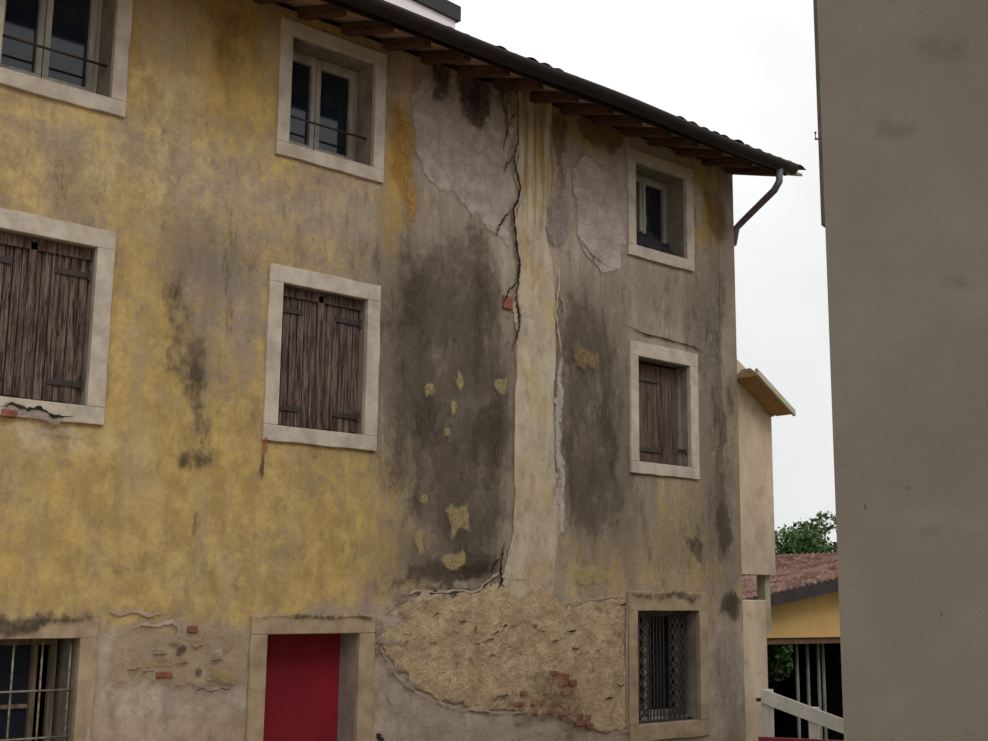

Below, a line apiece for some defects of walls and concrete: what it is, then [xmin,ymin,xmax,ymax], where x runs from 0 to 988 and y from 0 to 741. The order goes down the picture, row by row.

damp [391,228,507,589]
peeling [411,75,514,247]
crack [497,91,524,368]
crack [555,268,563,350]
damp [554,305,617,535]
peeling [572,155,628,273]
crack [628,326,705,354]
peeling [446,506,469,535]
crack [492,545,504,589]
spalling [375,551,629,733]